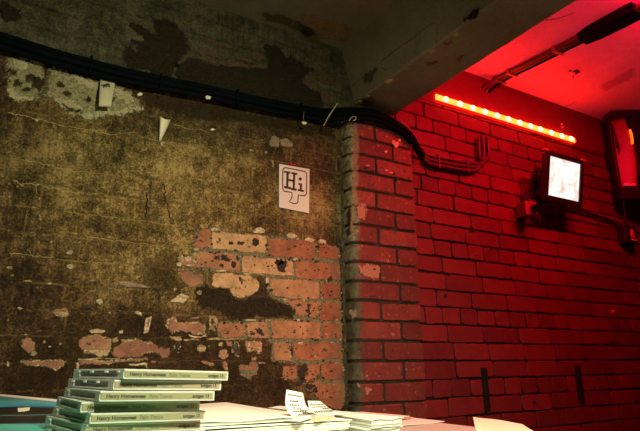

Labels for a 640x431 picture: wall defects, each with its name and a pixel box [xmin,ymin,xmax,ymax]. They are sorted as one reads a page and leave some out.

peeling [5,57,144,120]
damp [122,16,323,108]
crack [13,180,248,249]
spalling [52,307,69,318]
spalling [75,224,346,411]
damp [194,284,293,321]
spalling [21,334,66,371]